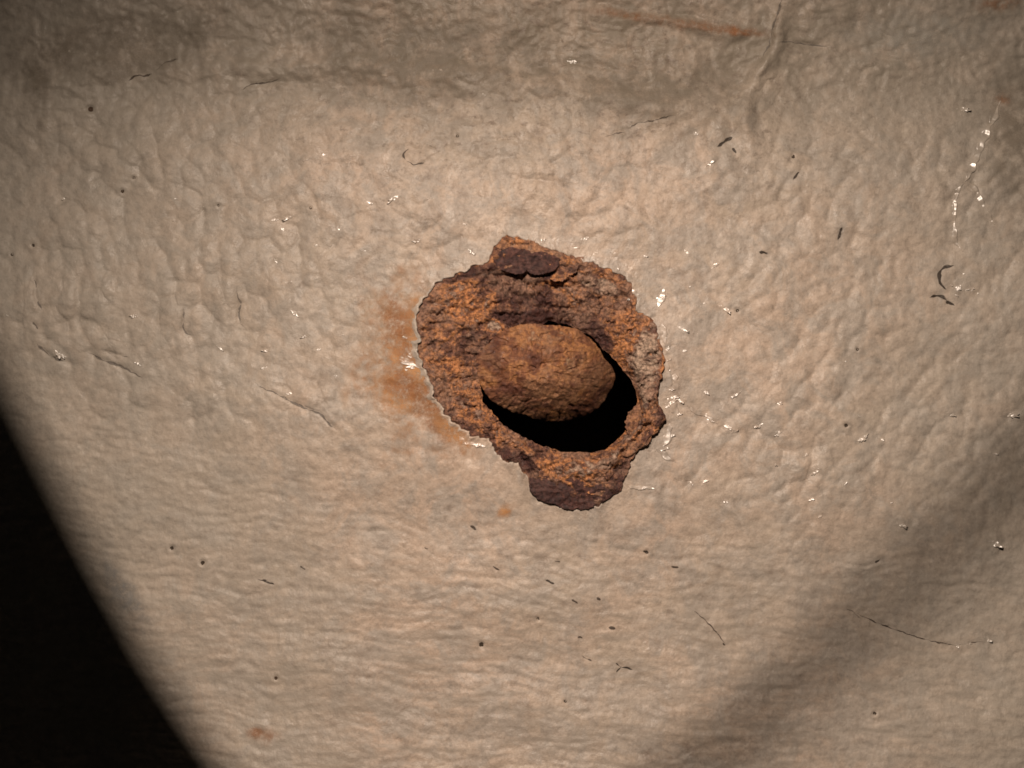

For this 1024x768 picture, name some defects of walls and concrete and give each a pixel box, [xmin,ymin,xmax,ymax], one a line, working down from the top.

crack [260,386,332,427]
rust [376,235,667,510]
peeling [399,223,738,522]
crack [851,610,980,646]